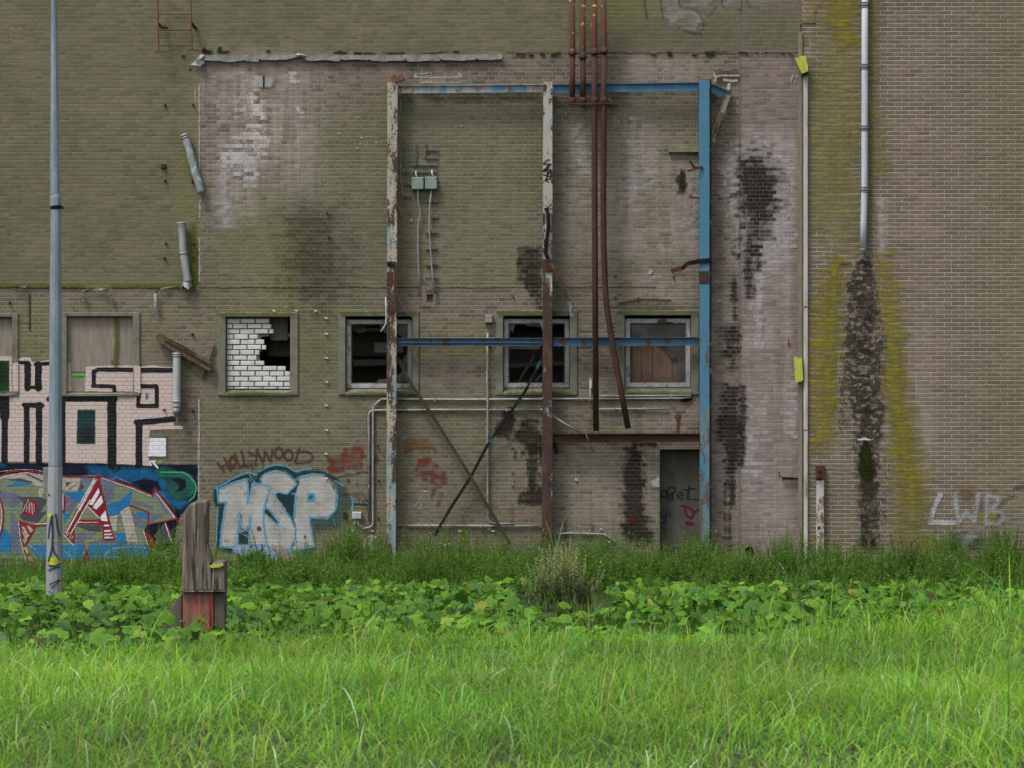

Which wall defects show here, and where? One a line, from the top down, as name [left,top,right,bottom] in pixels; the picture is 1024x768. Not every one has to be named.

water stain [216,76,271,228]
water stain [517,247,543,309]
water stain [711,136,798,369]
water stain [512,419,559,505]
water stain [619,443,653,546]
water stain [716,383,768,551]
water stain [784,381,798,438]
water stain [822,198,922,553]